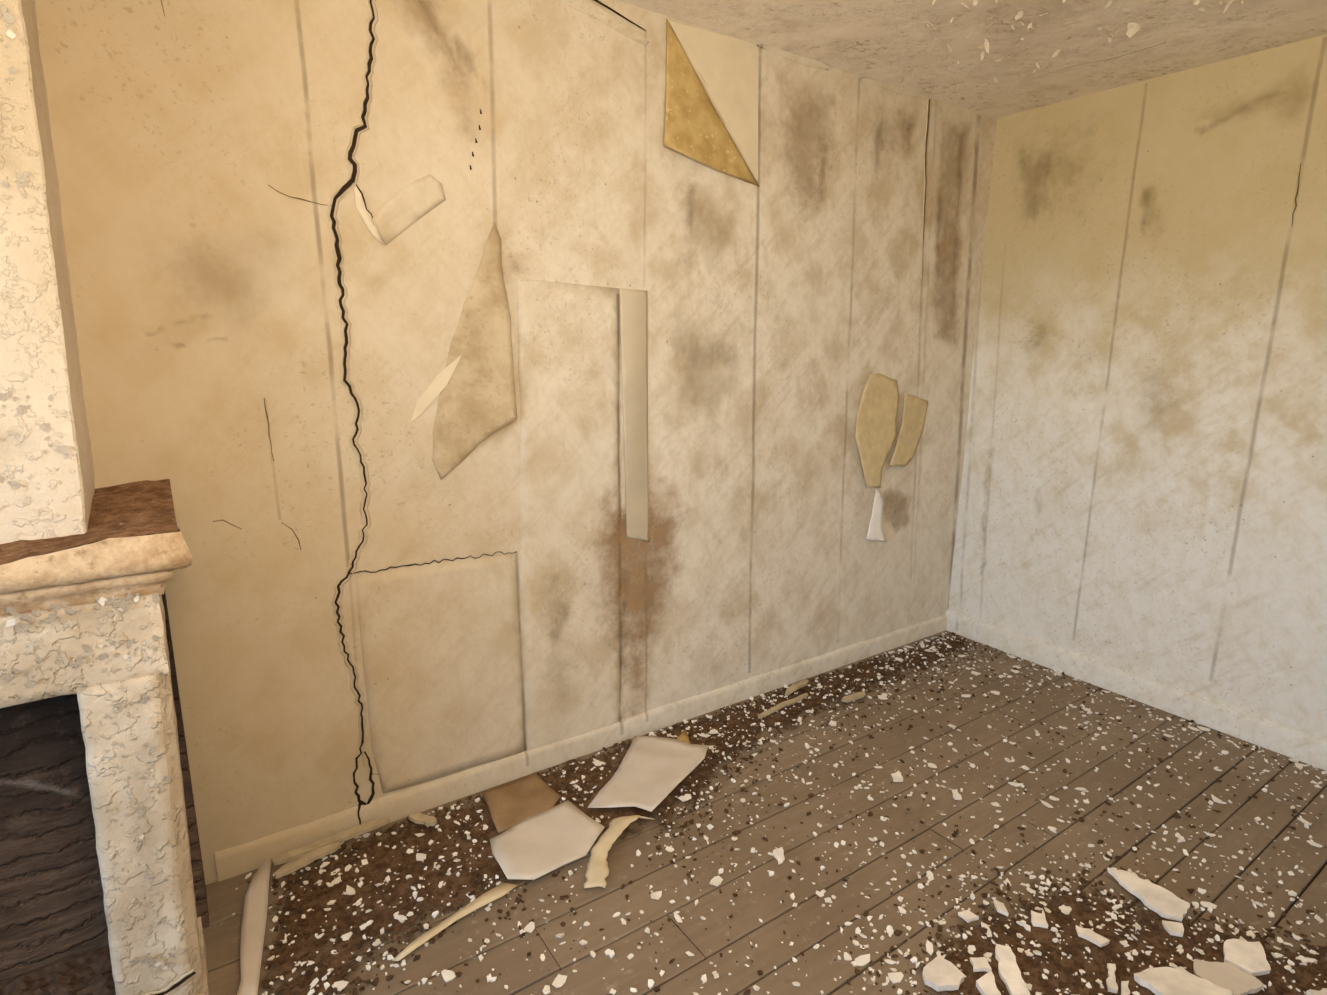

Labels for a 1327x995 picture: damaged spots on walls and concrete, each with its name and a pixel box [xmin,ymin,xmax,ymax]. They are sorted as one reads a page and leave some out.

crack [268,0,517,824]
crack [594,0,646,31]